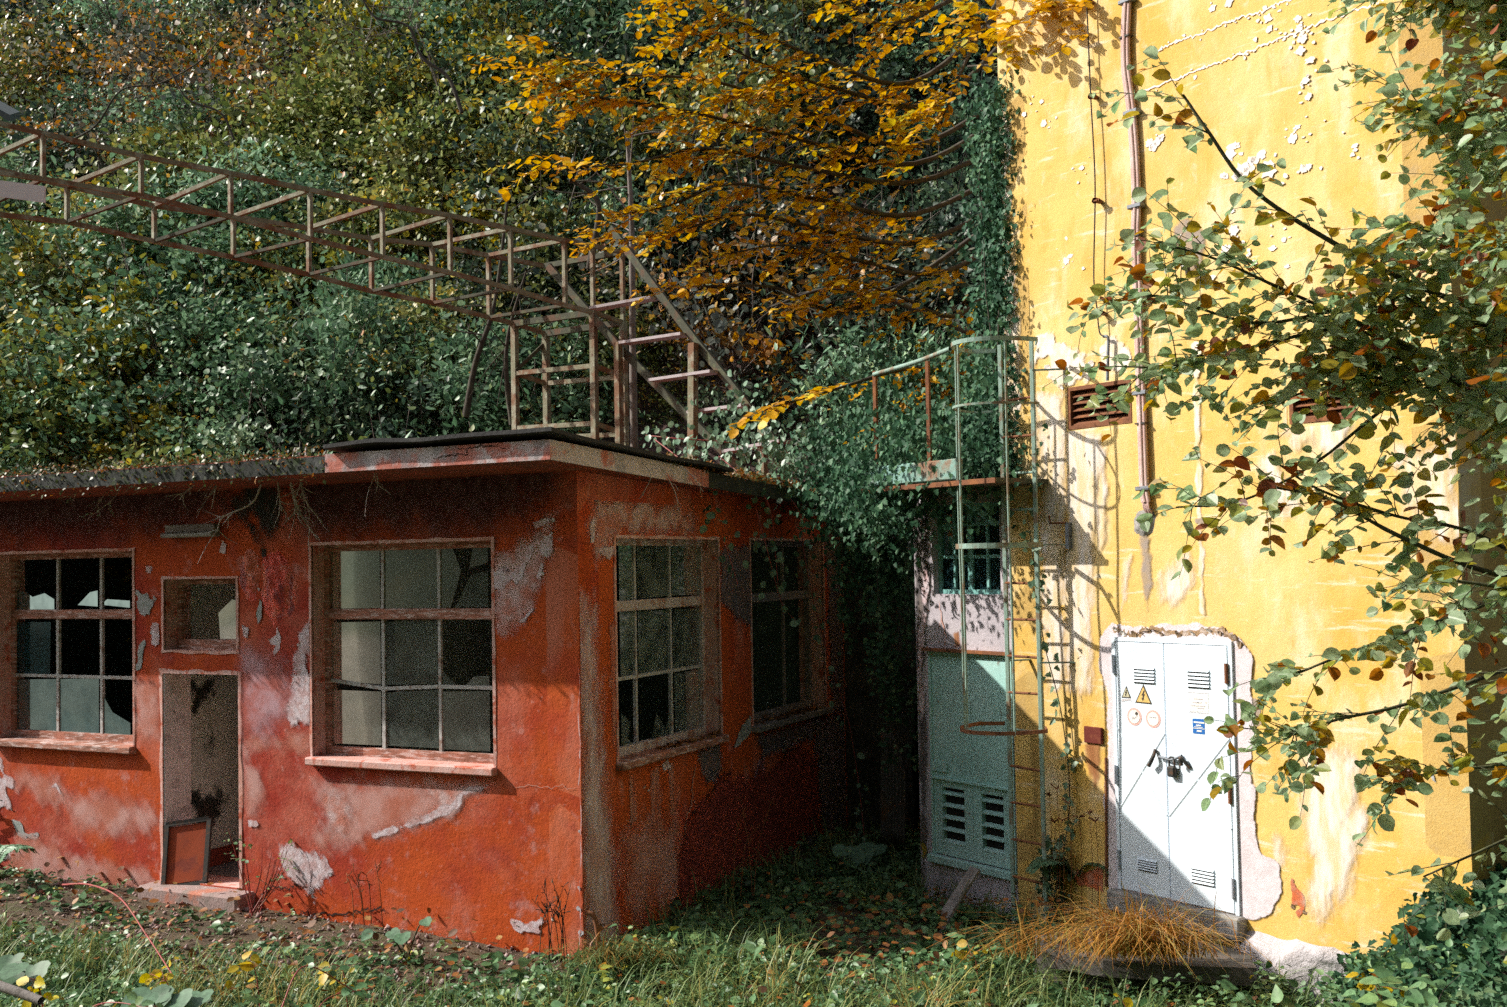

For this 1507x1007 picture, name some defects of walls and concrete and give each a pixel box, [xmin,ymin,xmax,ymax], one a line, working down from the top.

peeling [1144,0,1384,185]
damp [999,102,1012,220]
damp [1003,240,1107,693]
flaking render [241,599,262,638]
peeling [494,517,555,635]
peeling [590,501,694,559]
peeling [268,621,310,725]
flaking render [0,758,39,861]
peeling [279,842,333,898]
peeling [372,782,486,838]
damp [1299,739,1366,921]
flaking render [510,917,558,959]